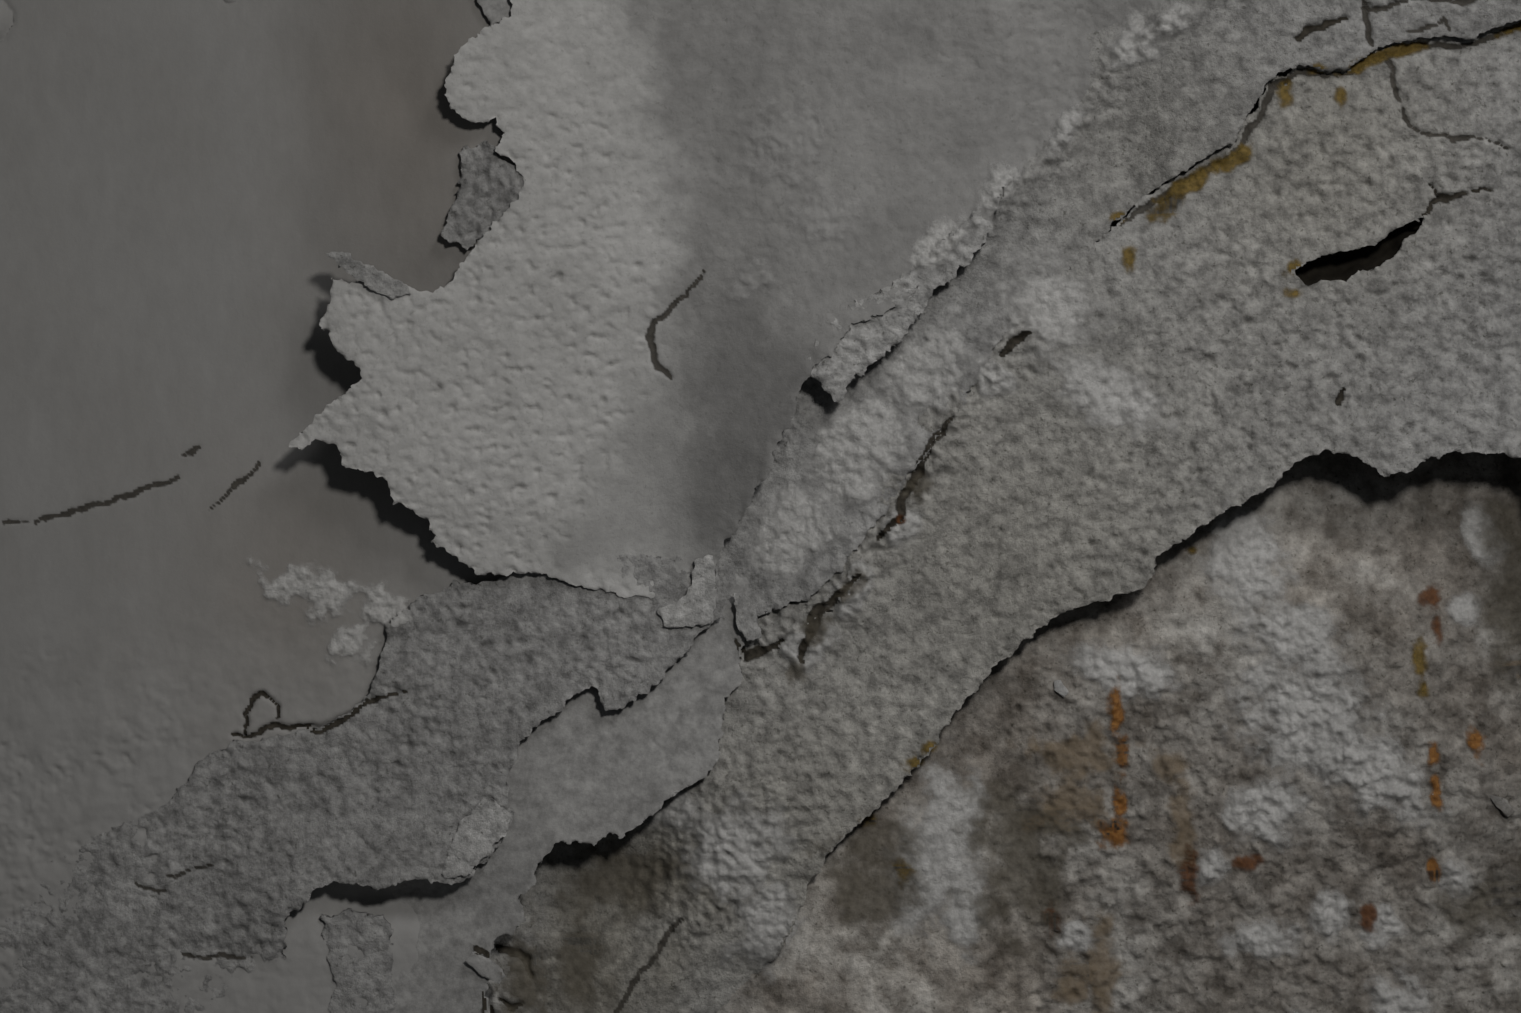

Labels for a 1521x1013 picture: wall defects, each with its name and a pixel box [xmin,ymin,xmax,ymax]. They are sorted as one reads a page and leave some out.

crack [1120,0,1521,226]
rust [1335,42,1427,104]
peeling [1402,20,1521,45]
rust [1147,144,1251,221]
crack [645,270,705,380]
crack [876,416,954,541]
peeling [320,30,1521,1013]
crack [734,574,861,664]
rust [1413,587,1442,697]
crack [231,690,408,738]
peeling [0,553,723,1013]
rust [1361,904,1377,931]